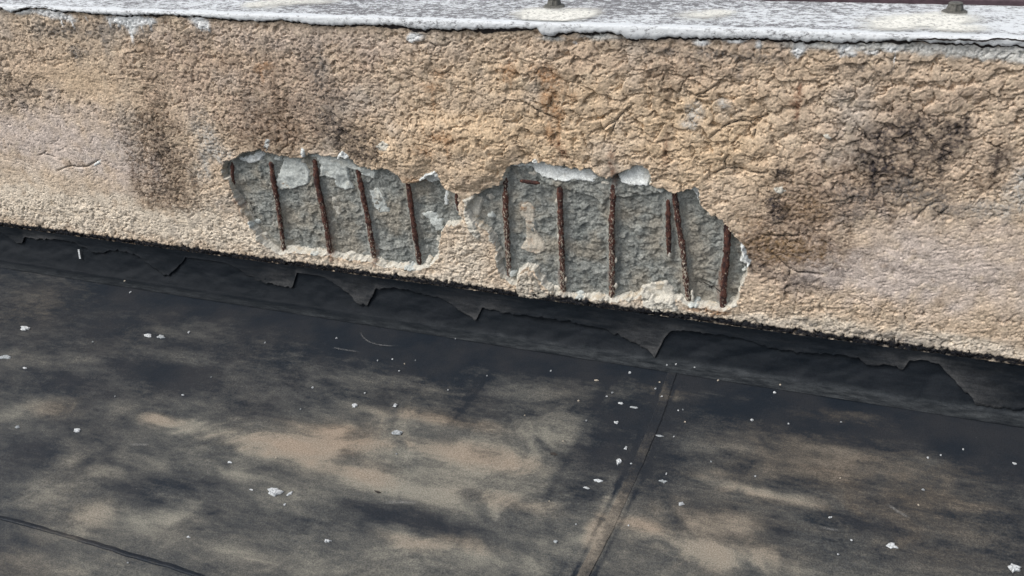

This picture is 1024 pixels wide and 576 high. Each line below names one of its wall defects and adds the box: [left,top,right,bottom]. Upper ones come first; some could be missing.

water stain [860,117,971,189]
corrosion [269,162,286,251]
corrosion [312,159,333,254]
corrosion [355,169,377,258]
corrosion [406,183,422,265]
spalling [221,139,751,312]
corrosion [502,177,540,277]
corrosion [555,186,568,292]
corrosion [608,170,618,298]
corrosion [665,193,699,311]
corrosion [717,224,731,314]
water stain [767,196,806,225]